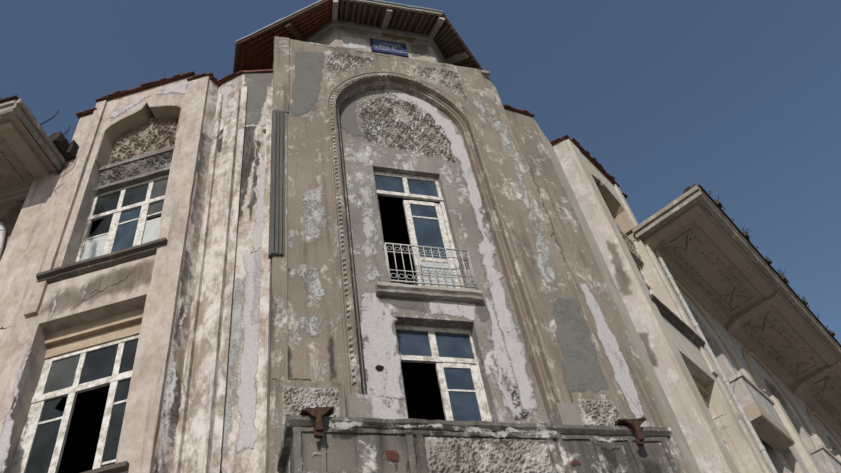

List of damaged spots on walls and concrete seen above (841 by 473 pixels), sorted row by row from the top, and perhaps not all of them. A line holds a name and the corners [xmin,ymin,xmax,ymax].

peeling [0,339,32,473]
peeling [298,314,323,336]
peeling [300,264,325,301]
peeling [300,186,328,239]
peeling [347,139,381,281]
peeling [359,292,405,419]
peeling [388,89,539,420]
peeling [580,283,647,427]